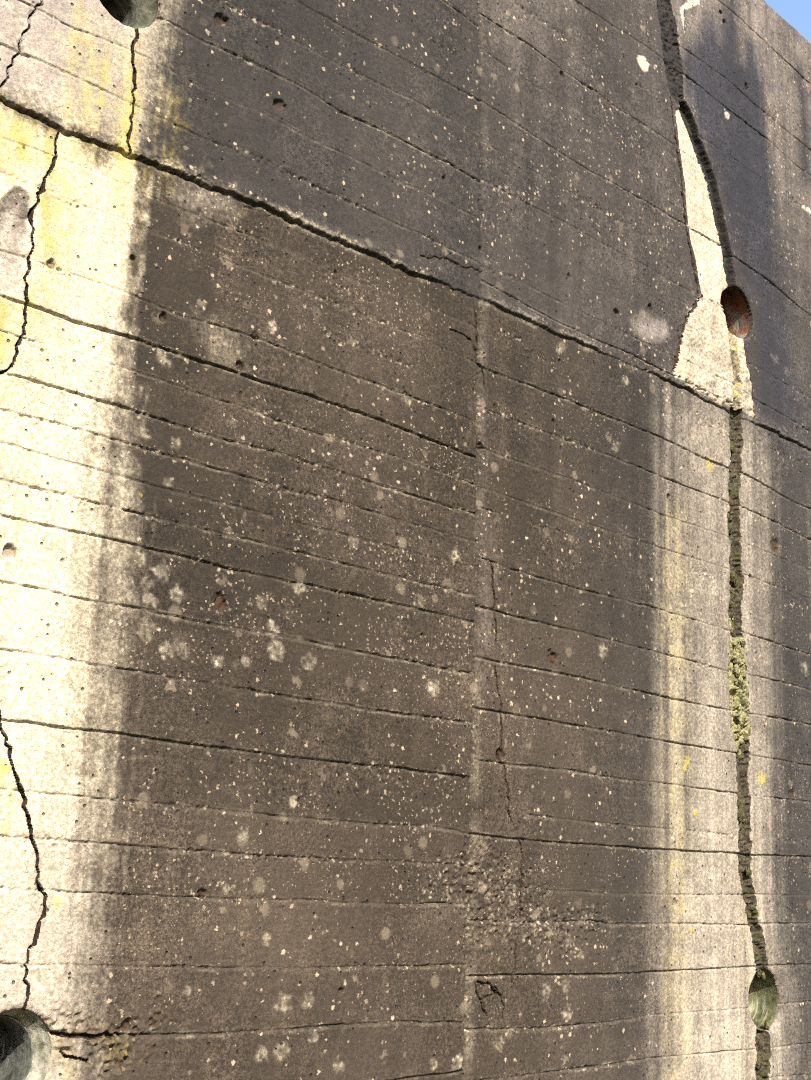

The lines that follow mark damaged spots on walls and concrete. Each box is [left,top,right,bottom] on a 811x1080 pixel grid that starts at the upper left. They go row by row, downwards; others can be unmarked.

crack [0,0,43,95]
crack [0,132,59,375]
crack [126,28,139,156]
leakage [466,0,597,81]
crack [657,0,736,376]
spalling [675,107,728,303]
leakage [626,0,811,1080]
crack [725,318,769,981]
crack [0,710,48,1010]
crack [489,560,525,983]
crack [49,1030,120,1063]
crack [751,1017,772,1080]